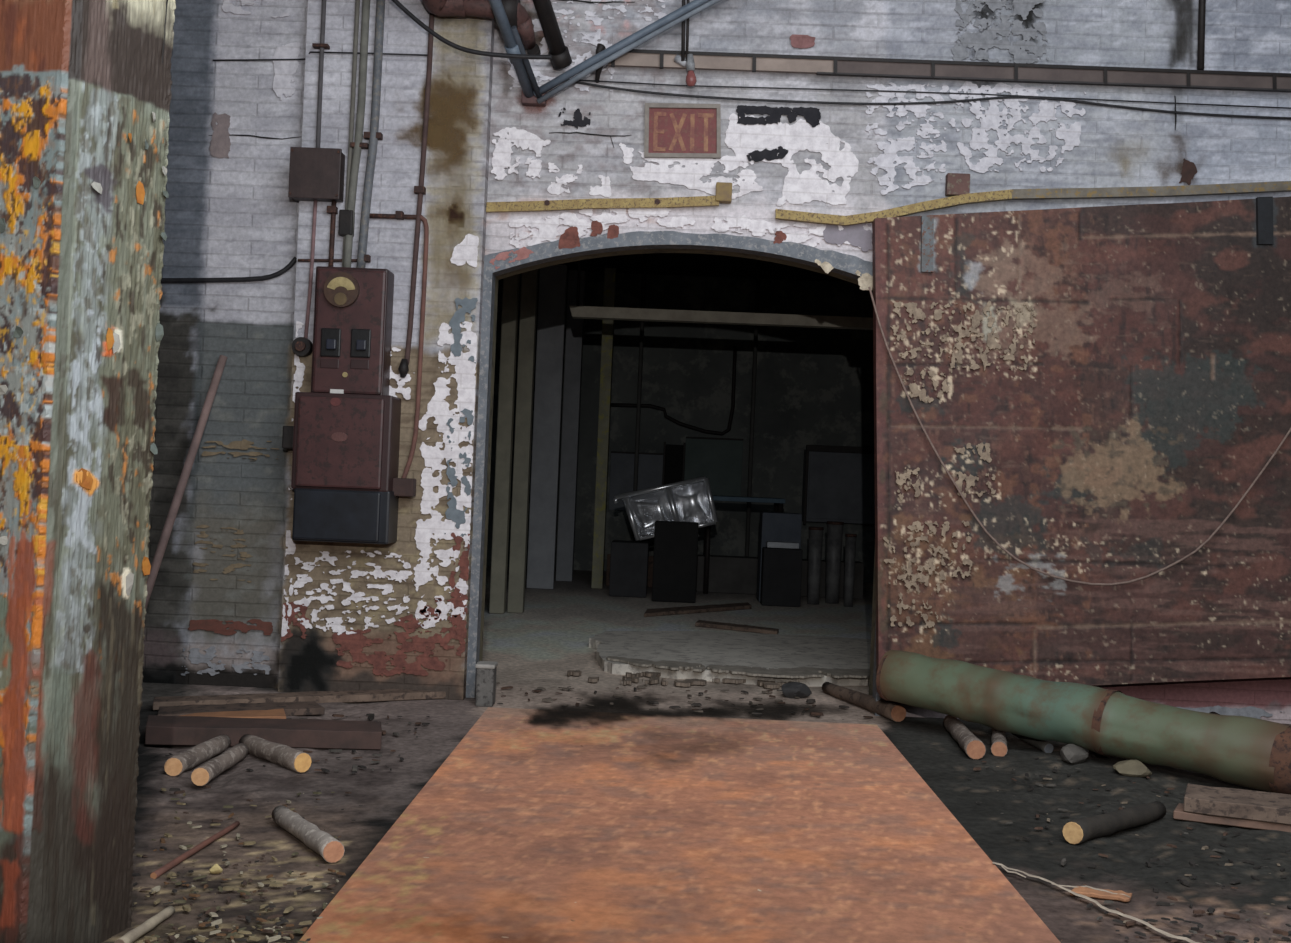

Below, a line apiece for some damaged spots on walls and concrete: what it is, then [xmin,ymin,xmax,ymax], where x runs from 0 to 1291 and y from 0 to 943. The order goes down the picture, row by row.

peeling [531,0,667,92]
water stain [977,6,994,19]
peeling [951,0,1049,64]
water stain [1015,3,1043,49]
water stain [1171,0,1192,64]
peeling [558,108,591,129]
peeling [619,81,1086,206]
peeling [450,127,695,269]
peeling [711,215,872,274]
spalling [855,270,873,291]
peeling [181,297,478,677]
water stain [531,695,831,726]